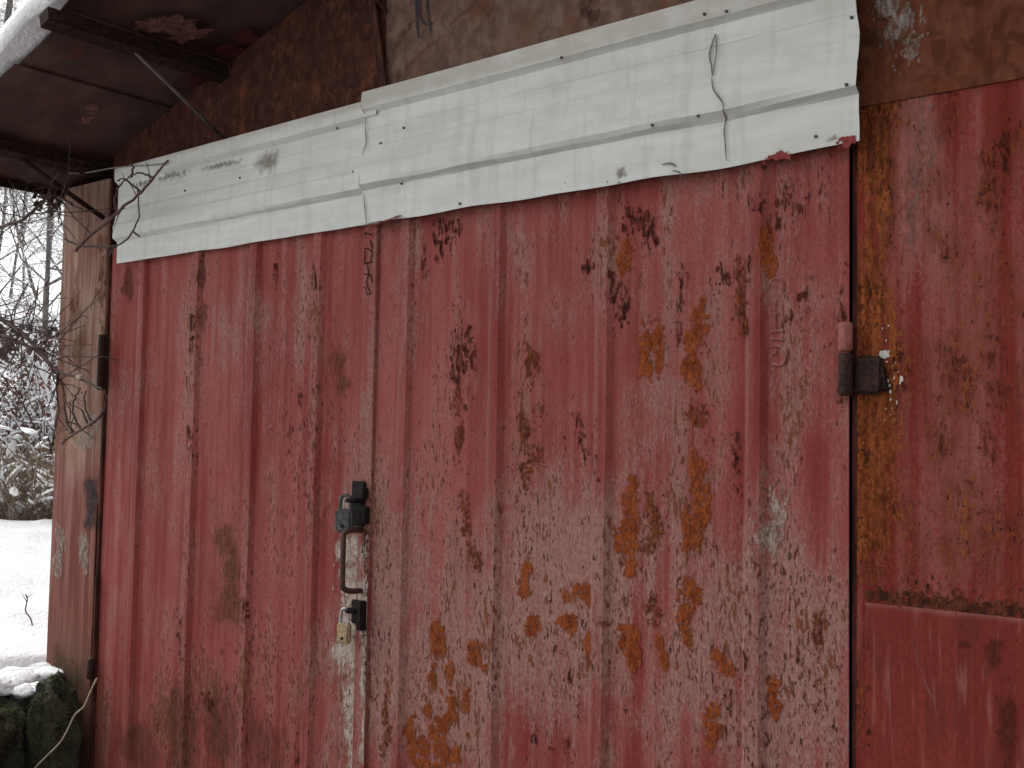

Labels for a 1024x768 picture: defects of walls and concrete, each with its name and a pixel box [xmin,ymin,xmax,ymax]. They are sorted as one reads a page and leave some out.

rust [133,14,214,45]
peeling [878,0,929,65]
rust [731,224,778,339]
rust [448,314,479,475]
rust [679,296,711,555]
rust [611,473,664,582]
peeling [750,479,791,563]
peeling [331,531,369,768]
rust [378,617,488,768]
rust [523,573,591,676]
rust [614,575,737,679]
rust [864,573,1024,618]